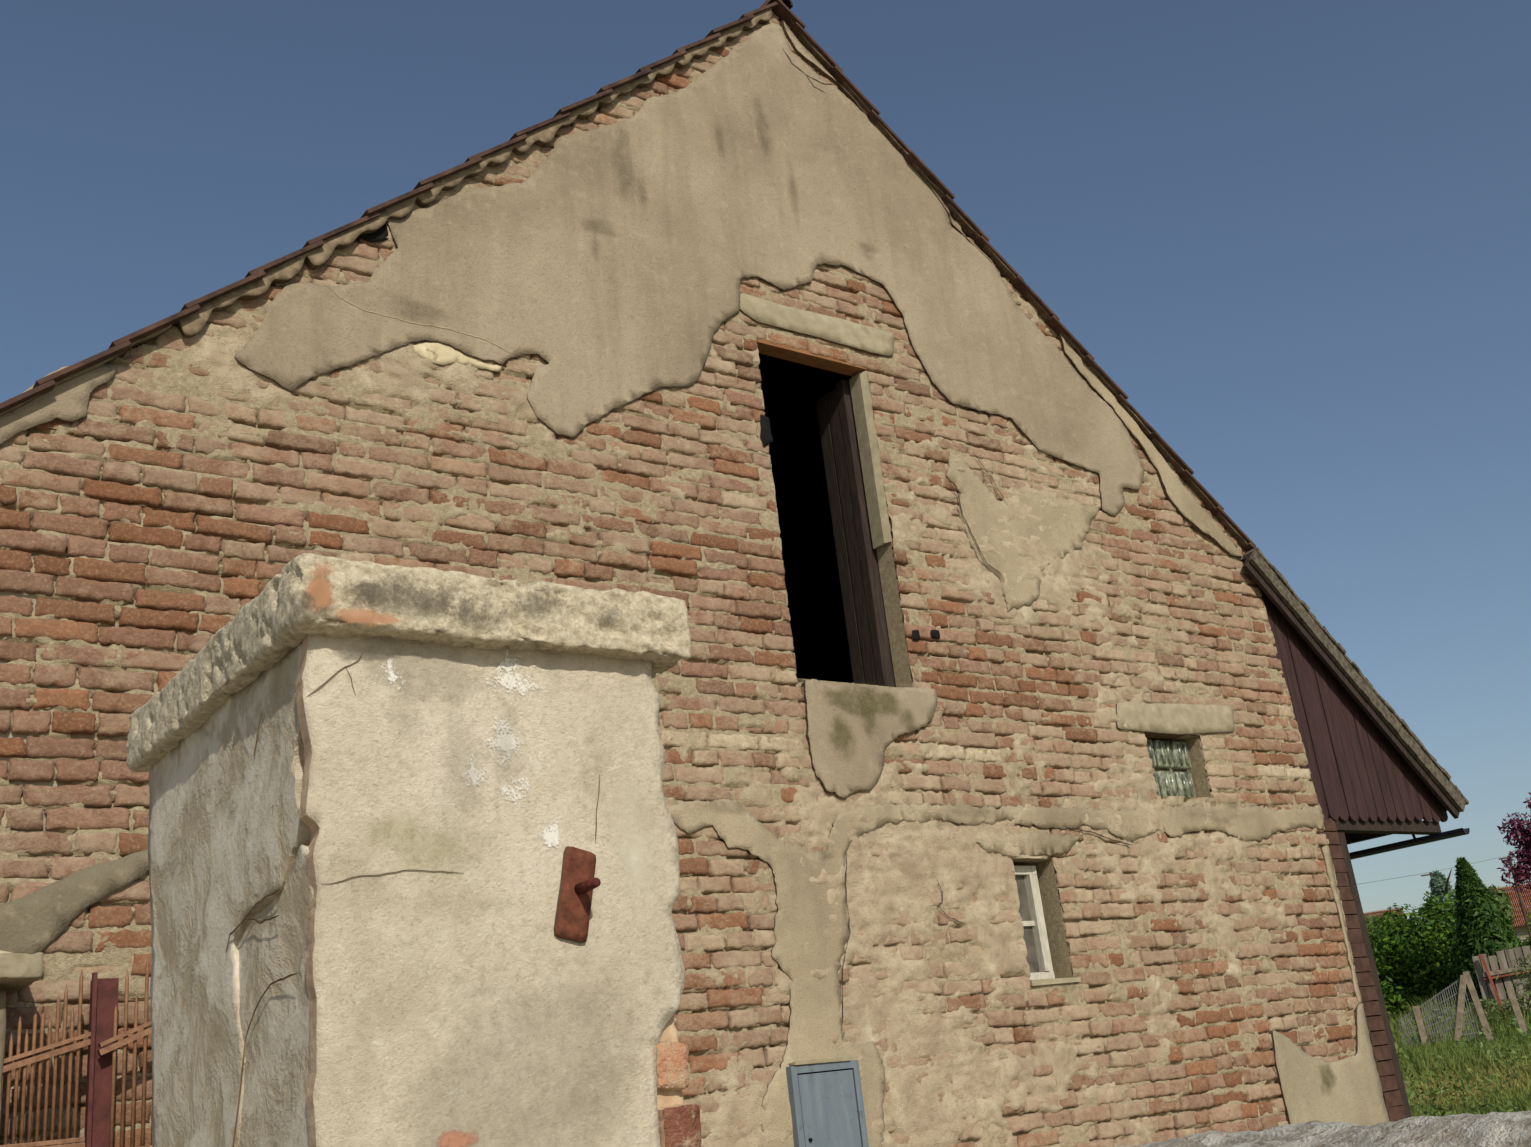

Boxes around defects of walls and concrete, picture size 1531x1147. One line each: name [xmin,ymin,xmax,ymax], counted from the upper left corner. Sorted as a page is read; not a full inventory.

peeling [235,20,1243,612]
peeling [0,365,117,444]
spalling [305,562,399,625]
crack [308,652,364,696]
spalling [910,630,940,640]
peeling [0,850,149,954]
crack [225,890,279,953]
crack [328,870,464,884]
peeling [668,679,1390,1147]
crack [232,973,298,1147]
spalling [654,1041,701,1147]
spalling [438,1130,477,1147]